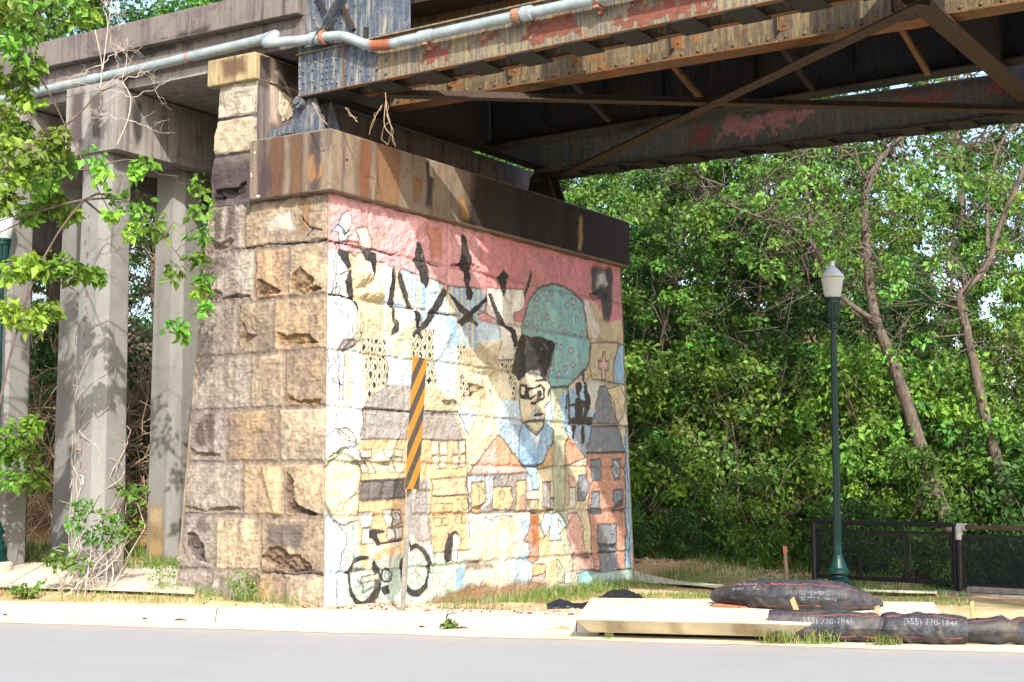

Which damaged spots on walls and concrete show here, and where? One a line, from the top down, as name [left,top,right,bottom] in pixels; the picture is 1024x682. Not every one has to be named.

peeling [521,10,582,47]
peeling [613,0,718,29]
corrosion [370,38,391,51]
peeling [897,86,954,113]
peeling [687,108,815,149]
corrosion [307,155,323,182]
corrosion [360,138,399,205]
spalling [205,267,322,302]
spalling [276,331,319,346]
spalling [285,470,318,516]
spalling [186,531,207,562]
spalling [262,546,313,574]